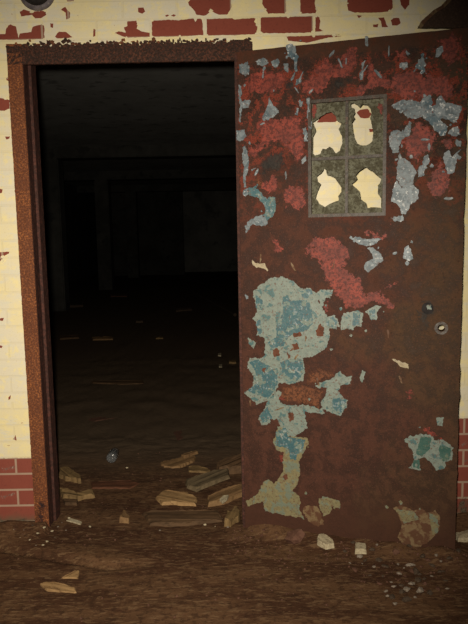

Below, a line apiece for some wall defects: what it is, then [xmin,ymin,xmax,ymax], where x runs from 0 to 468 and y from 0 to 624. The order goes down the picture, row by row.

peeling [0,9,73,40]
corrosion [39,37,234,47]
peeling [116,0,340,142]
peeling [346,0,409,27]
peeling [399,50,427,74]
peeling [389,94,462,222]
peeling [236,130,276,233]
peeling [350,236,383,272]
corrosion [281,368,335,409]
peeling [244,276,384,550]
peeling [404,427,453,471]
peeling [385,500,440,547]